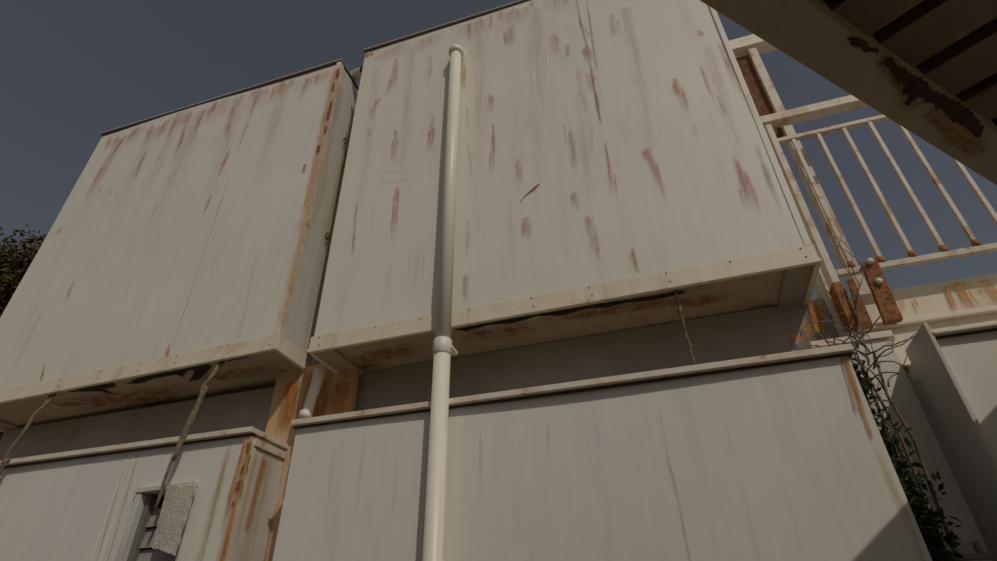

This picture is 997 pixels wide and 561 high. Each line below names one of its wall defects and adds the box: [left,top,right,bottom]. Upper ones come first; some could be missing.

peeling [847,37,984,138]
spalling [454,290,685,331]
spalling [69,364,212,395]
corrosion [280,369,349,421]
corrosion [217,440,251,561]
corrosion [247,453,266,525]